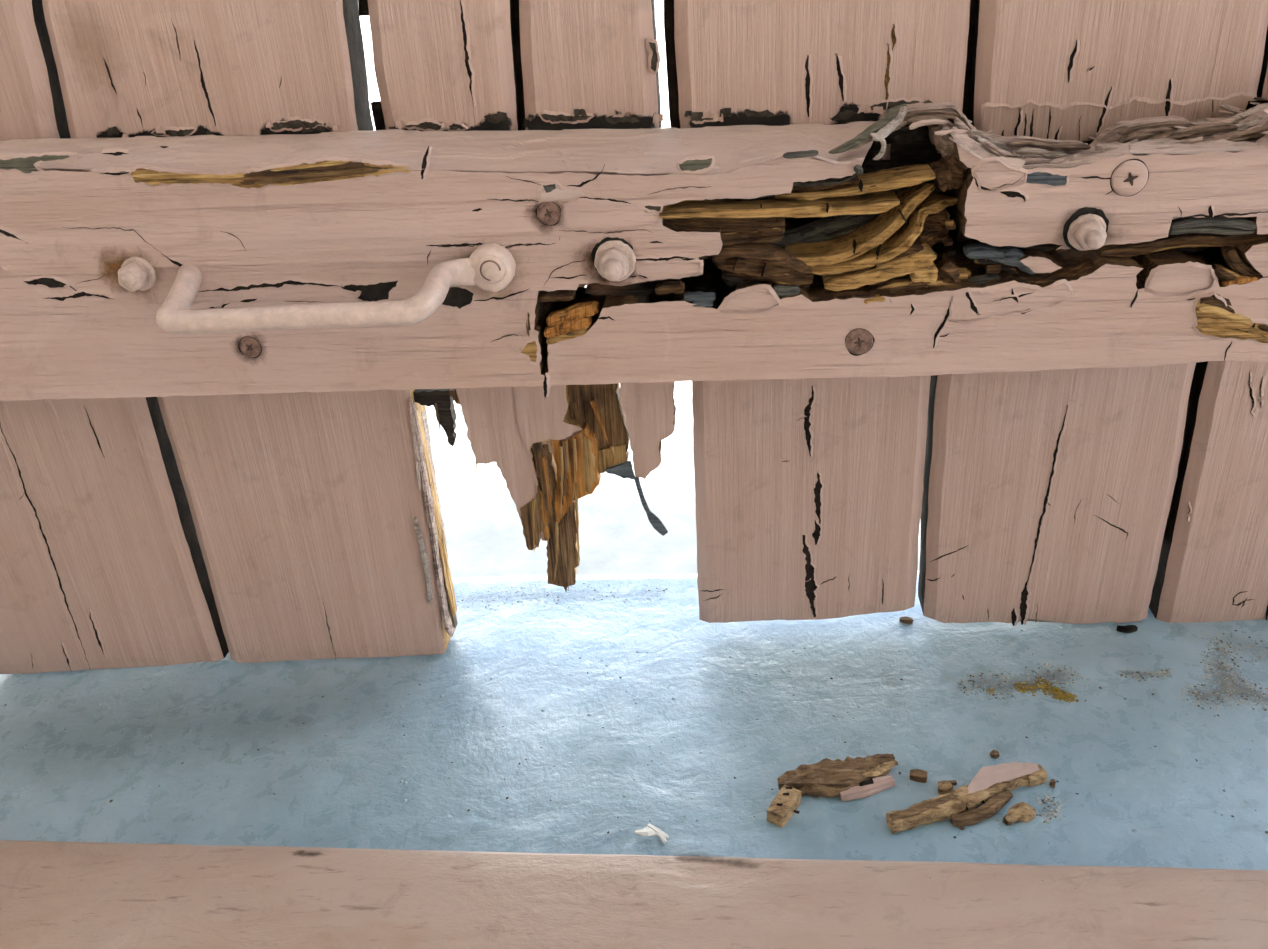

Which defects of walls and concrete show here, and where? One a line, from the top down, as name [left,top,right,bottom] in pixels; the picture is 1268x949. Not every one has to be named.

peeling [783,92,1268,194]
crack [41,274,114,301]
rust [103,254,142,283]
crack [63,227,344,309]
peeling [634,258,703,281]
peeling [717,284,782,314]
peeling [948,279,1075,324]
peeling [1145,261,1268,346]
crack [0,423,108,671]
peeling [409,398,668,637]
crack [781,386,850,617]
crack [927,405,1128,626]